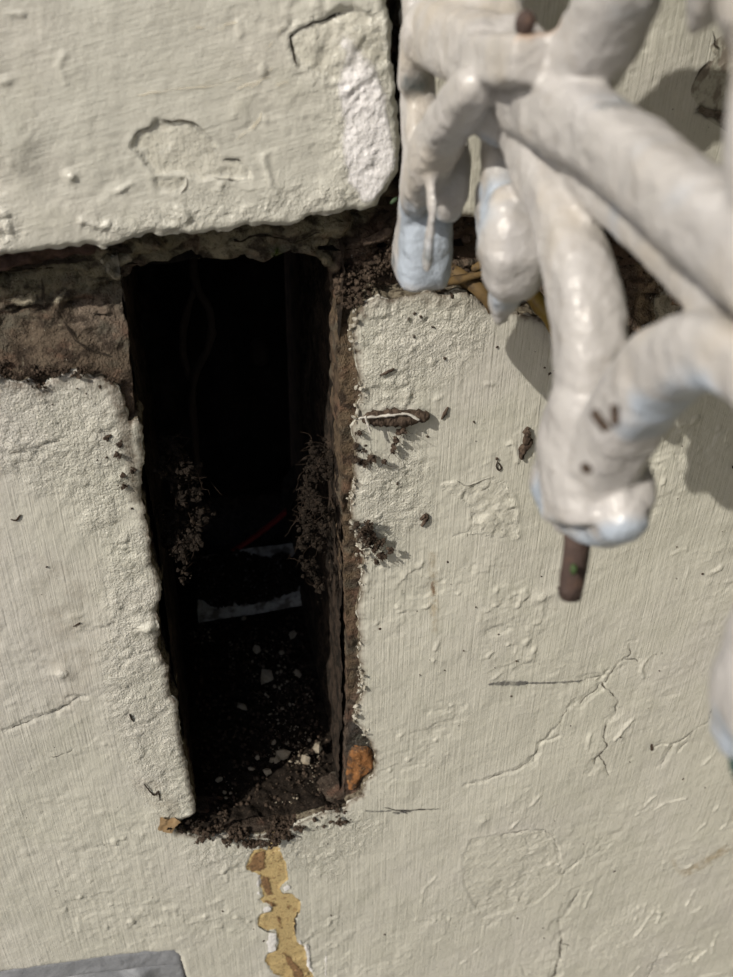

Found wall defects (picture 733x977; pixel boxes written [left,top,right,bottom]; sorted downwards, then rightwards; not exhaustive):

peeling [691,32,731,130]
spalling [453,216,476,246]
spalling [614,255,684,340]
spalling [0,6,400,977]
crack [471,648,638,784]